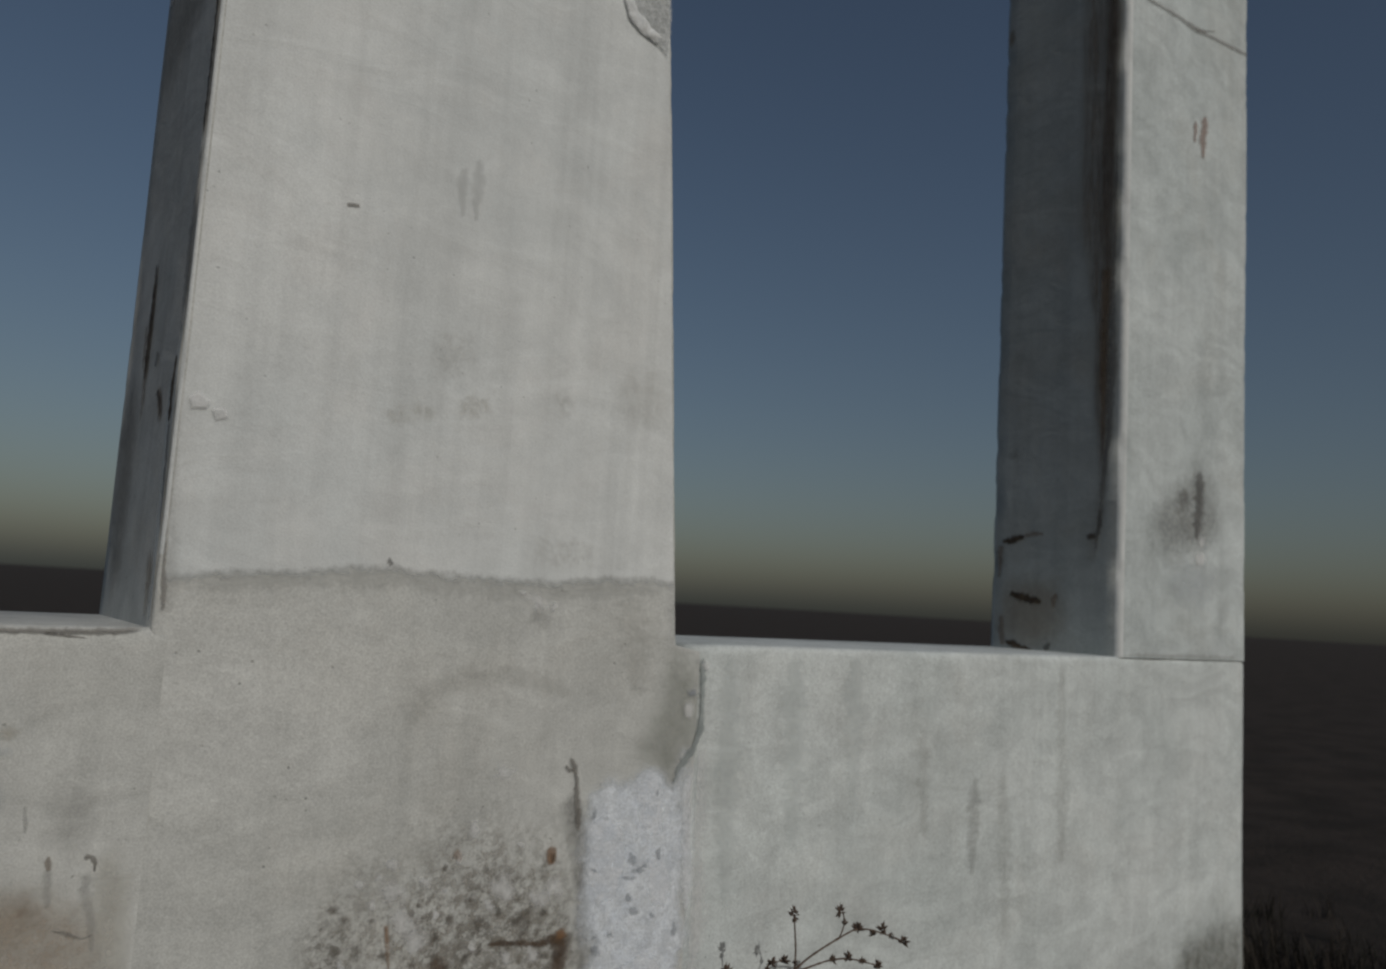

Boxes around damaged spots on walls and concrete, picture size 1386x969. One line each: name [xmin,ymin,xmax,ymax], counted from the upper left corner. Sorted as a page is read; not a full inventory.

spalling [626,0,671,53]
rust [144,266,157,378]
rust [1003,535,1024,544]
rust [1010,591,1041,604]
rust [1006,640,1049,651]
peeling [581,768,692,969]
damp [356,854,558,967]
rust [489,930,567,969]